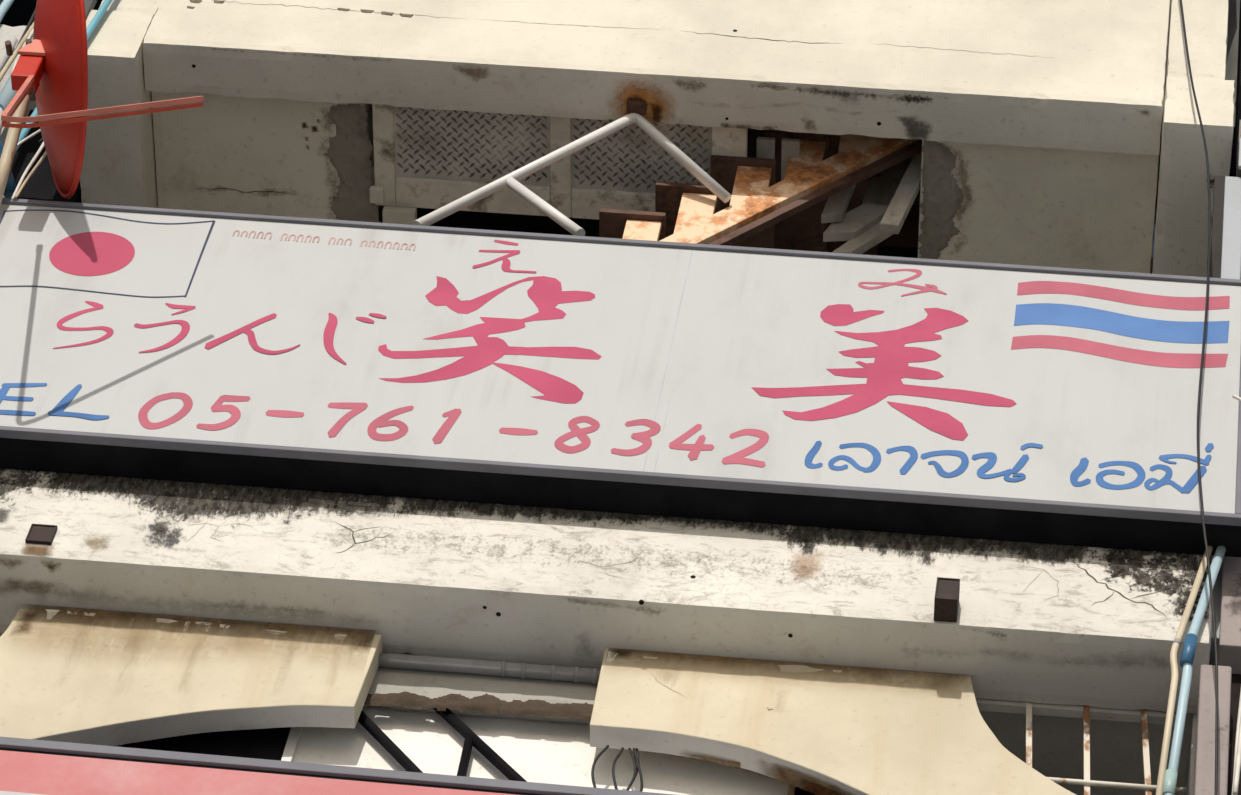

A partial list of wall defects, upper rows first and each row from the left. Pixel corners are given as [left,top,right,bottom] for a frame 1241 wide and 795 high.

spalling [324,103,381,223]
corrosion [617,85,669,123]
spalling [918,140,963,259]
water stain [0,468,1211,629]
crack [1023,562,1167,618]
spalling [364,691,594,721]